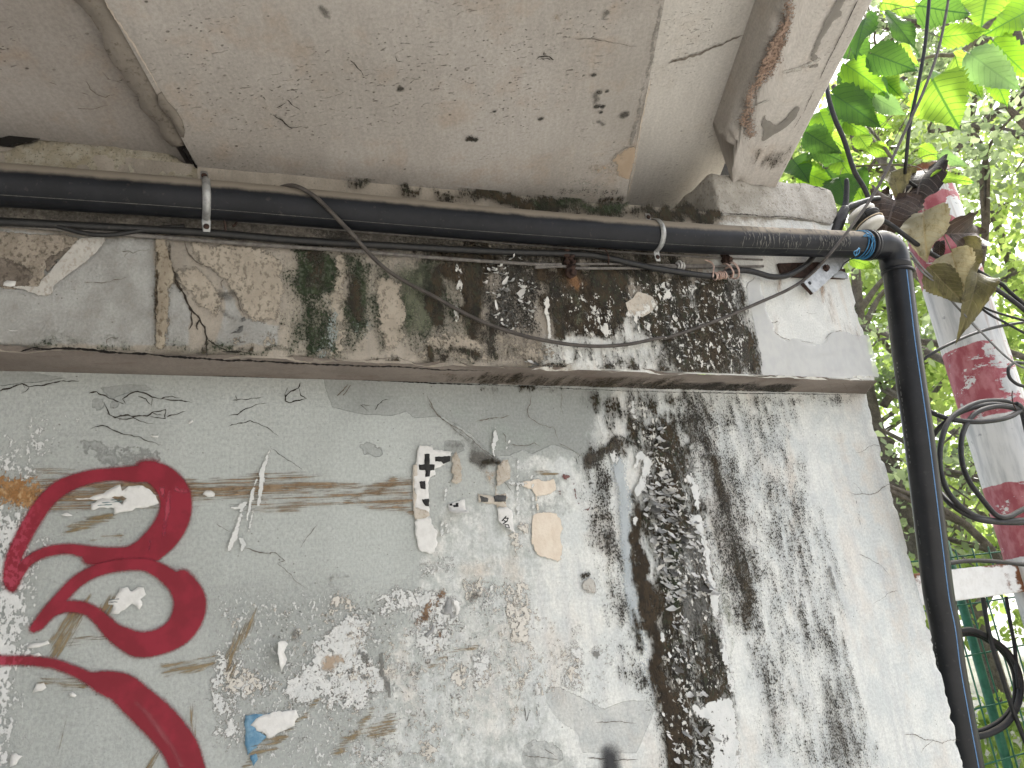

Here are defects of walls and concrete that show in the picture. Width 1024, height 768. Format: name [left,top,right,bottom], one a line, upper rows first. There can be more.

spalling [737,0,796,140]
spalling [0,231,79,290]
peeling [177,242,285,349]
water stain [279,245,384,358]
peeling [324,247,350,359]
peeling [374,275,407,351]
crack [0,241,870,468]
water stain [397,237,879,768]
peeling [209,479,615,768]
peeling [608,399,741,768]